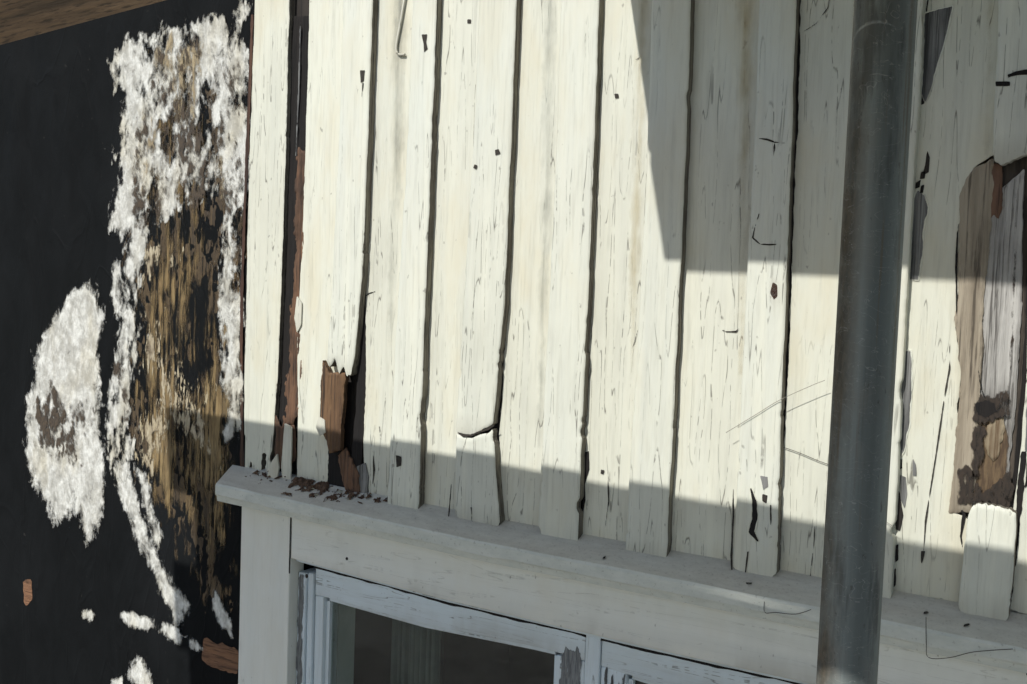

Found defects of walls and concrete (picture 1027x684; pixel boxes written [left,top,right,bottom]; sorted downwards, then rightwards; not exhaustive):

peeling [921,0,954,105]
water stain [132,30,246,229]
peeling [910,151,930,281]
water stain [33,379,96,467]
water stain [113,353,129,421]
peeling [267,424,292,480]
peeling [316,417,326,436]
crack [458,348,505,445]
peeling [748,476,768,543]
peeling [559,647,582,684]